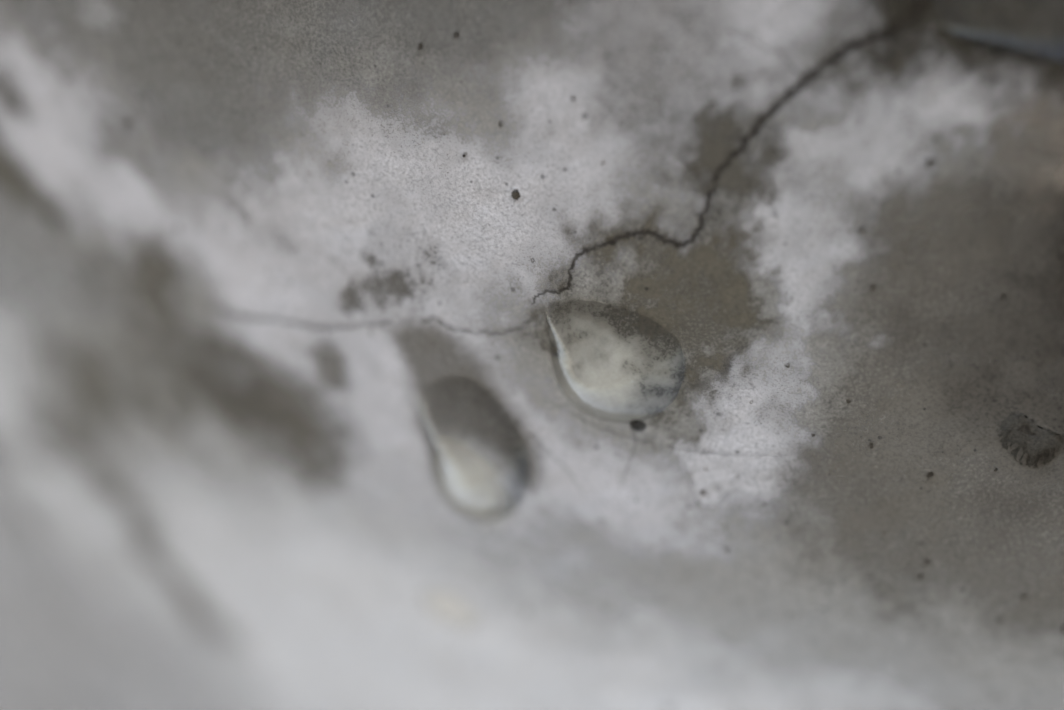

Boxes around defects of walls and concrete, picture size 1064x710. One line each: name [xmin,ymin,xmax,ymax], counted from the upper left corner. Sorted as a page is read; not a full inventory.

crack [532,0,927,306]
spalling [996,411,1064,469]